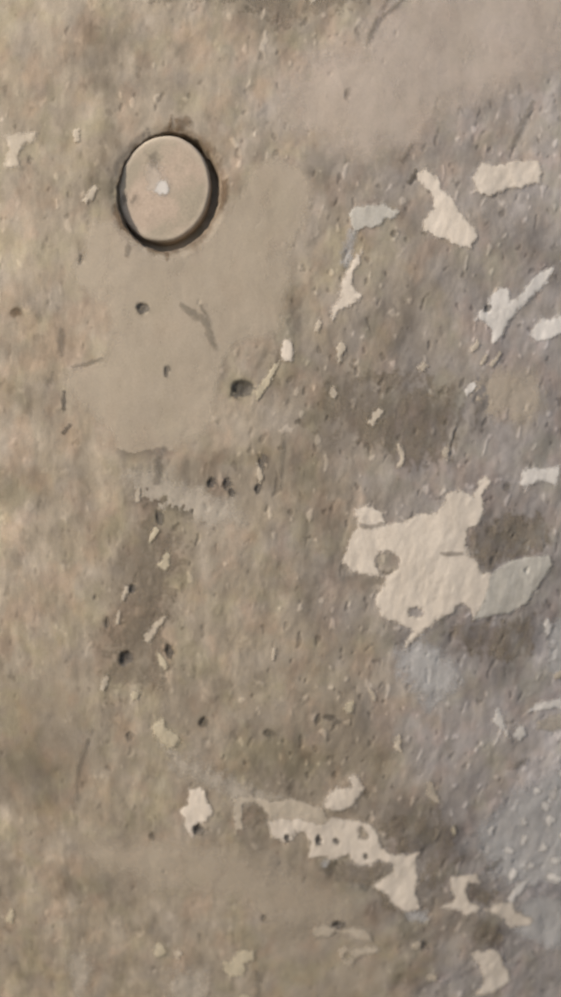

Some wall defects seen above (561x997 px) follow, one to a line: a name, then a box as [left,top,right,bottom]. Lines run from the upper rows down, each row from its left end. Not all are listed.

peeling [416,169,477,248]
peeling [472,160,542,196]
peeling [470,267,553,367]
peeling [530,315,561,341]
peeling [342,476,552,647]
peeling [180,788,213,836]
peeling [234,774,456,912]
peeling [441,818,535,996]